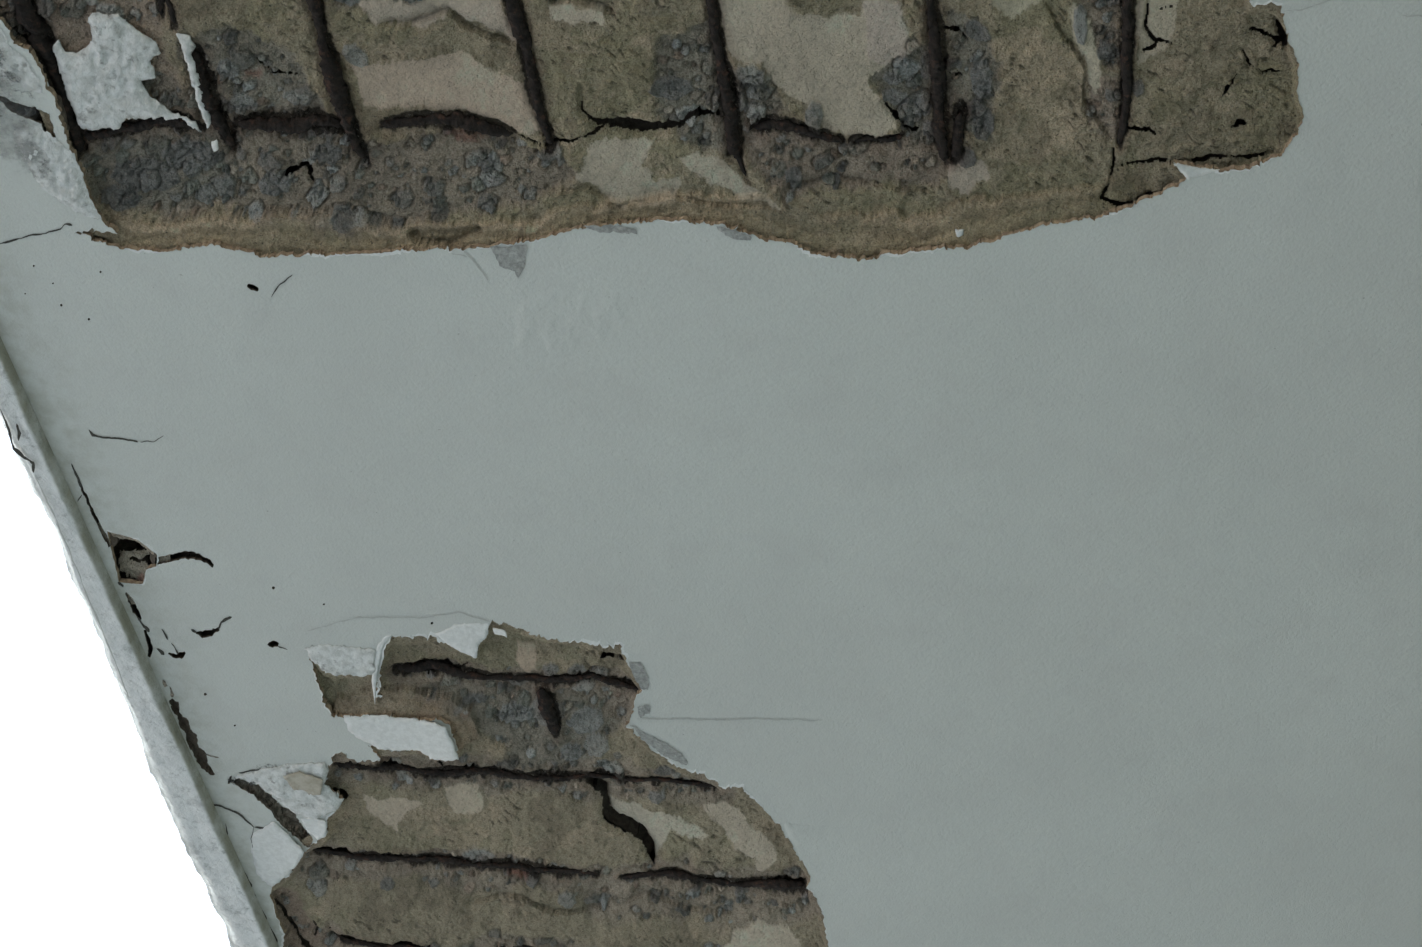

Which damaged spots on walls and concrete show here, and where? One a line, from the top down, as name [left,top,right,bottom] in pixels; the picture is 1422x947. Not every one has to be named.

spalling [0,0,1304,278]
spalling [98,523,214,604]
spalling [228,620,830,947]